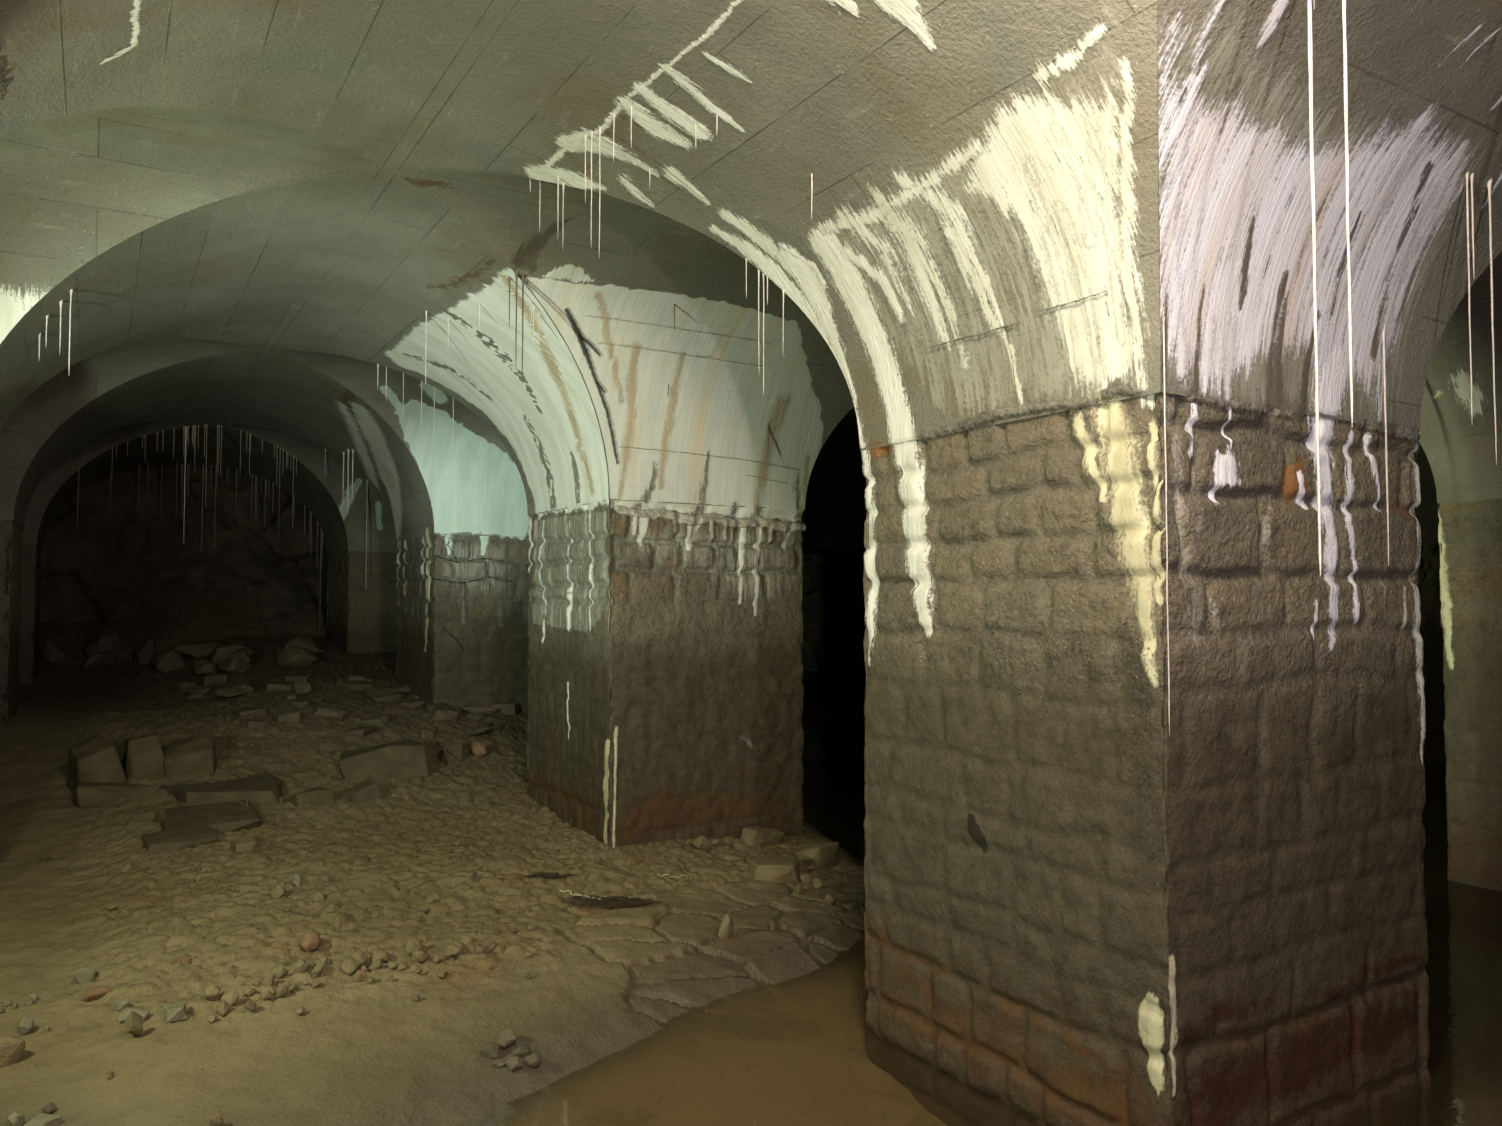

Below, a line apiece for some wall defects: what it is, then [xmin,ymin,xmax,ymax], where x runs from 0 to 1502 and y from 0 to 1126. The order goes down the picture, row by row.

water stain [0,284,48,344]
rust [596,295,639,502]
rust [659,354,684,488]
crack [565,308,799,483]
water stain [336,0,1501,688]
rust [1281,454,1307,506]
water stain [1380,432,1455,764]
water stain [603,726,618,848]
water stain [1138,955,1177,1097]